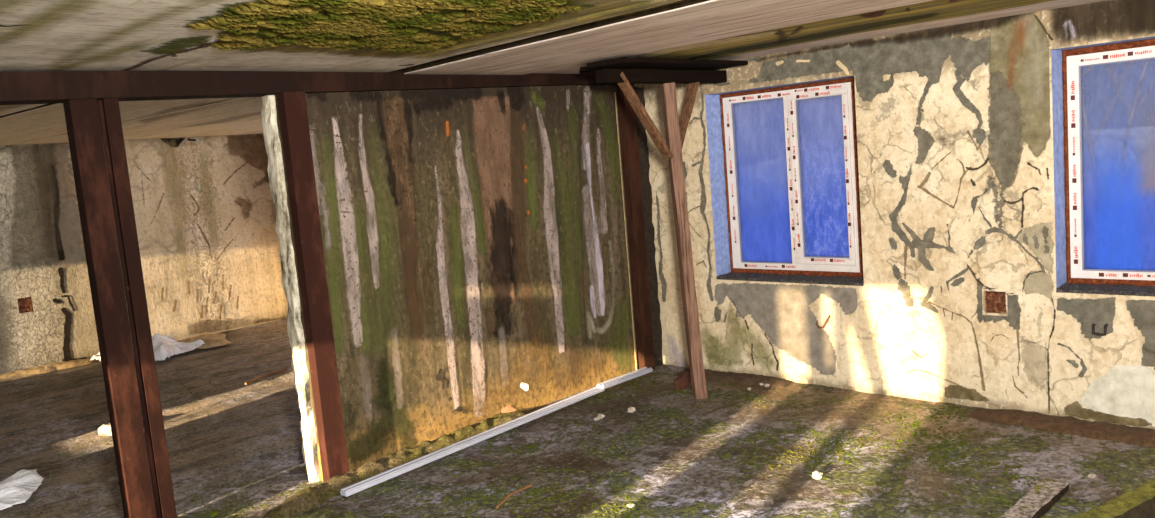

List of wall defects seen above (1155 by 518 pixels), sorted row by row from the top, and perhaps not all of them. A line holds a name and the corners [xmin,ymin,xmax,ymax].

crack [51,165,87,361]
crack [136,166,235,260]
damp [332,91,398,351]
damp [404,87,565,417]
damp [582,86,608,317]
flaking render [748,13,1155,370]
crack [917,128,989,208]
crack [1004,162,1049,228]
flaking render [1058,343,1087,377]
flaking render [1064,401,1151,427]